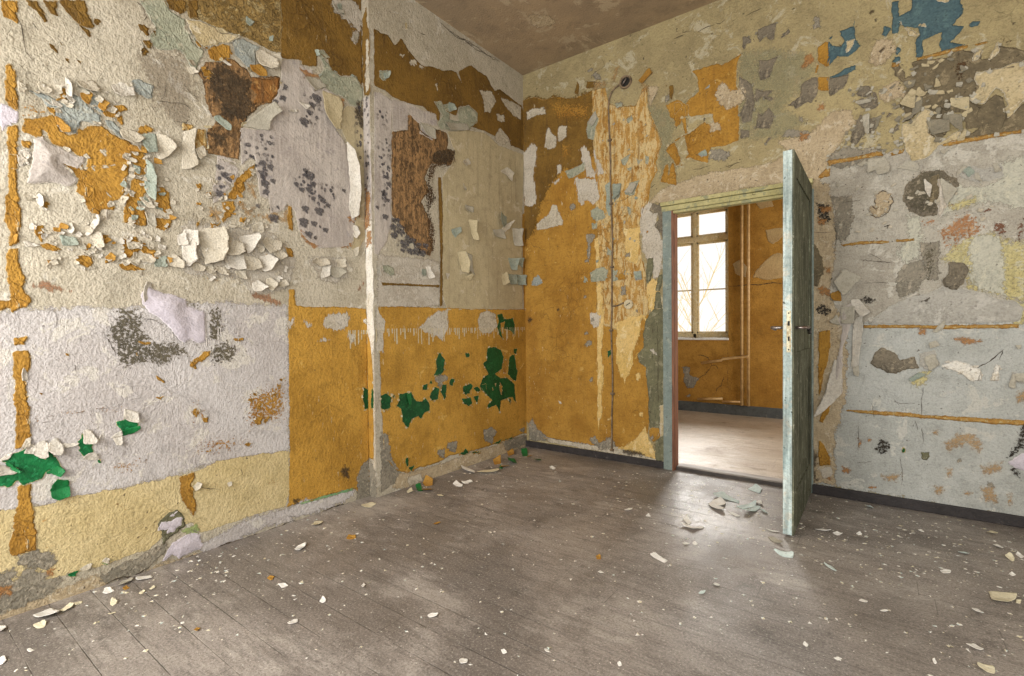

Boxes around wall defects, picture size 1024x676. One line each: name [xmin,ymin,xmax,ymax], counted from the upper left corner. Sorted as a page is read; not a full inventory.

peeling [0,0,790,620]
peeling [764,0,1024,486]